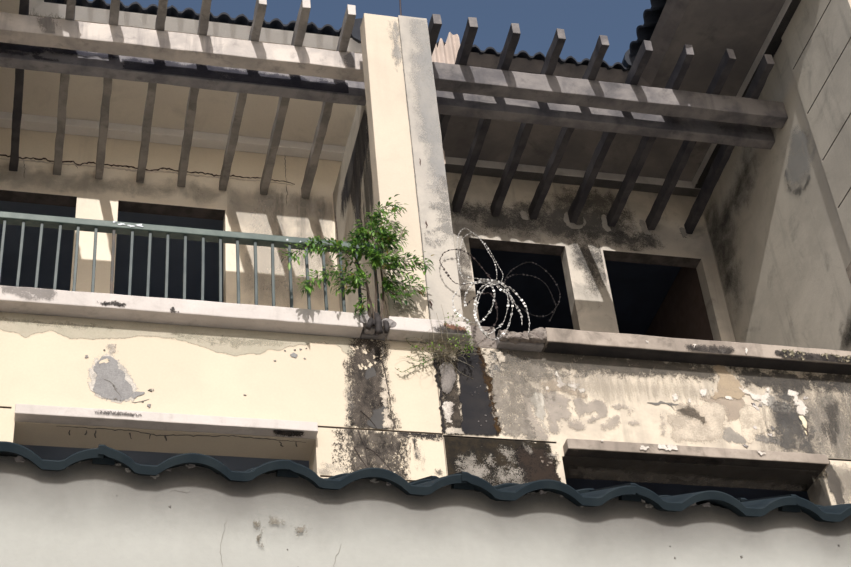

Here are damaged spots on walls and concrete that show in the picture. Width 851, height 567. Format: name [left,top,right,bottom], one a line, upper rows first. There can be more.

water stain [390,21,402,64]
water stain [742,0,801,97]
crack [0,154,295,204]
water stain [412,19,662,291]
water stain [671,144,722,197]
water stain [456,248,473,300]
peeling [85,344,154,417]
peeling [546,371,586,393]
crack [60,426,306,447]
water stain [0,312,851,534]
peeling [640,365,775,455]
peeling [787,390,808,436]